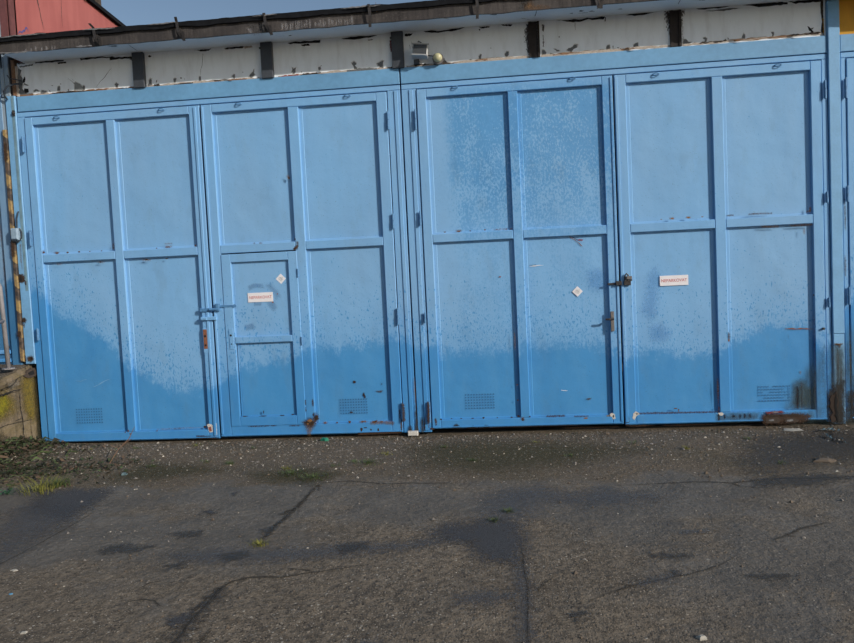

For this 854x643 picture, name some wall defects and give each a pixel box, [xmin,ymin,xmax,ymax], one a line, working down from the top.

spalling [17,66,134,97]
spalling [147,69,260,87]
rust [243,400,406,435]
rust [640,382,811,426]
rust [828,391,854,425]